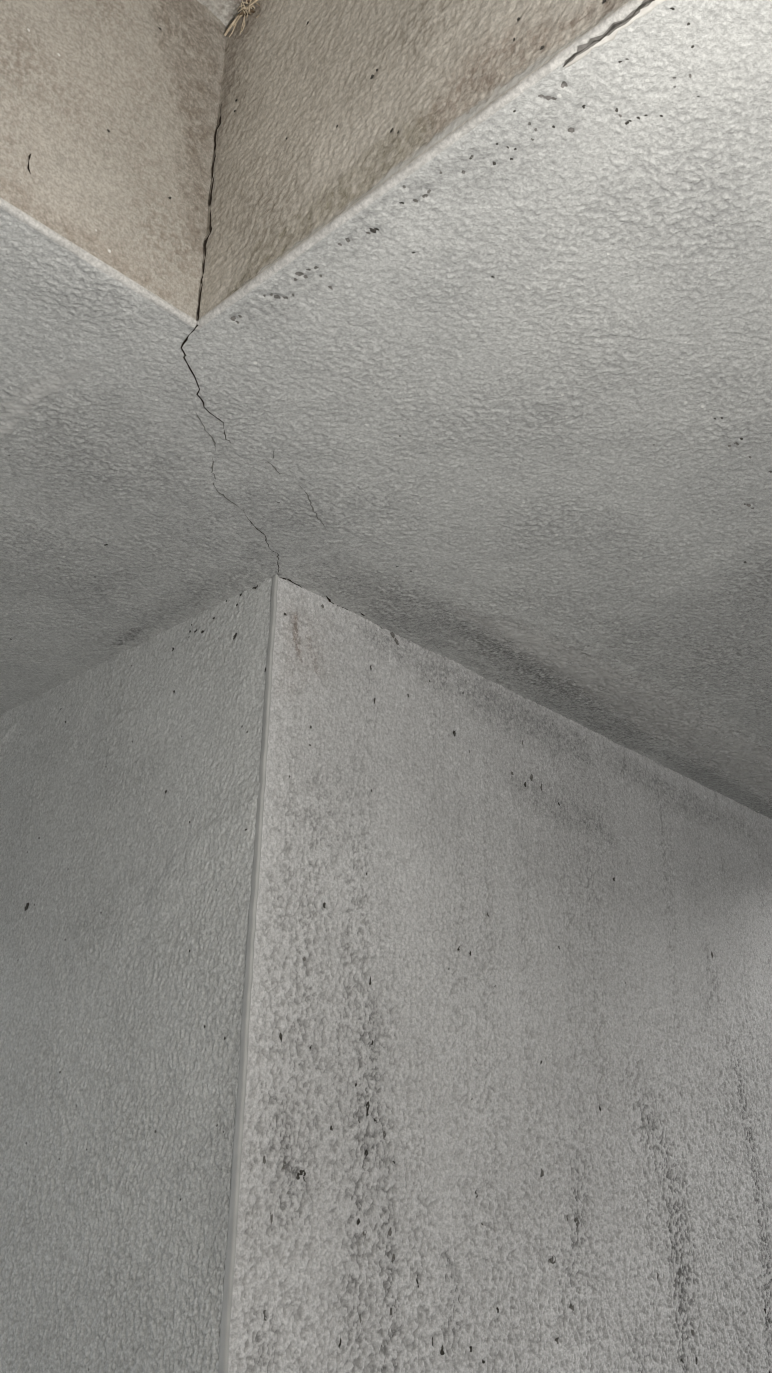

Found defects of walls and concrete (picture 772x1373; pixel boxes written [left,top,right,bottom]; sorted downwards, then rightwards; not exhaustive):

crack [181,104,365,616]
leakage [263,266,333,299]